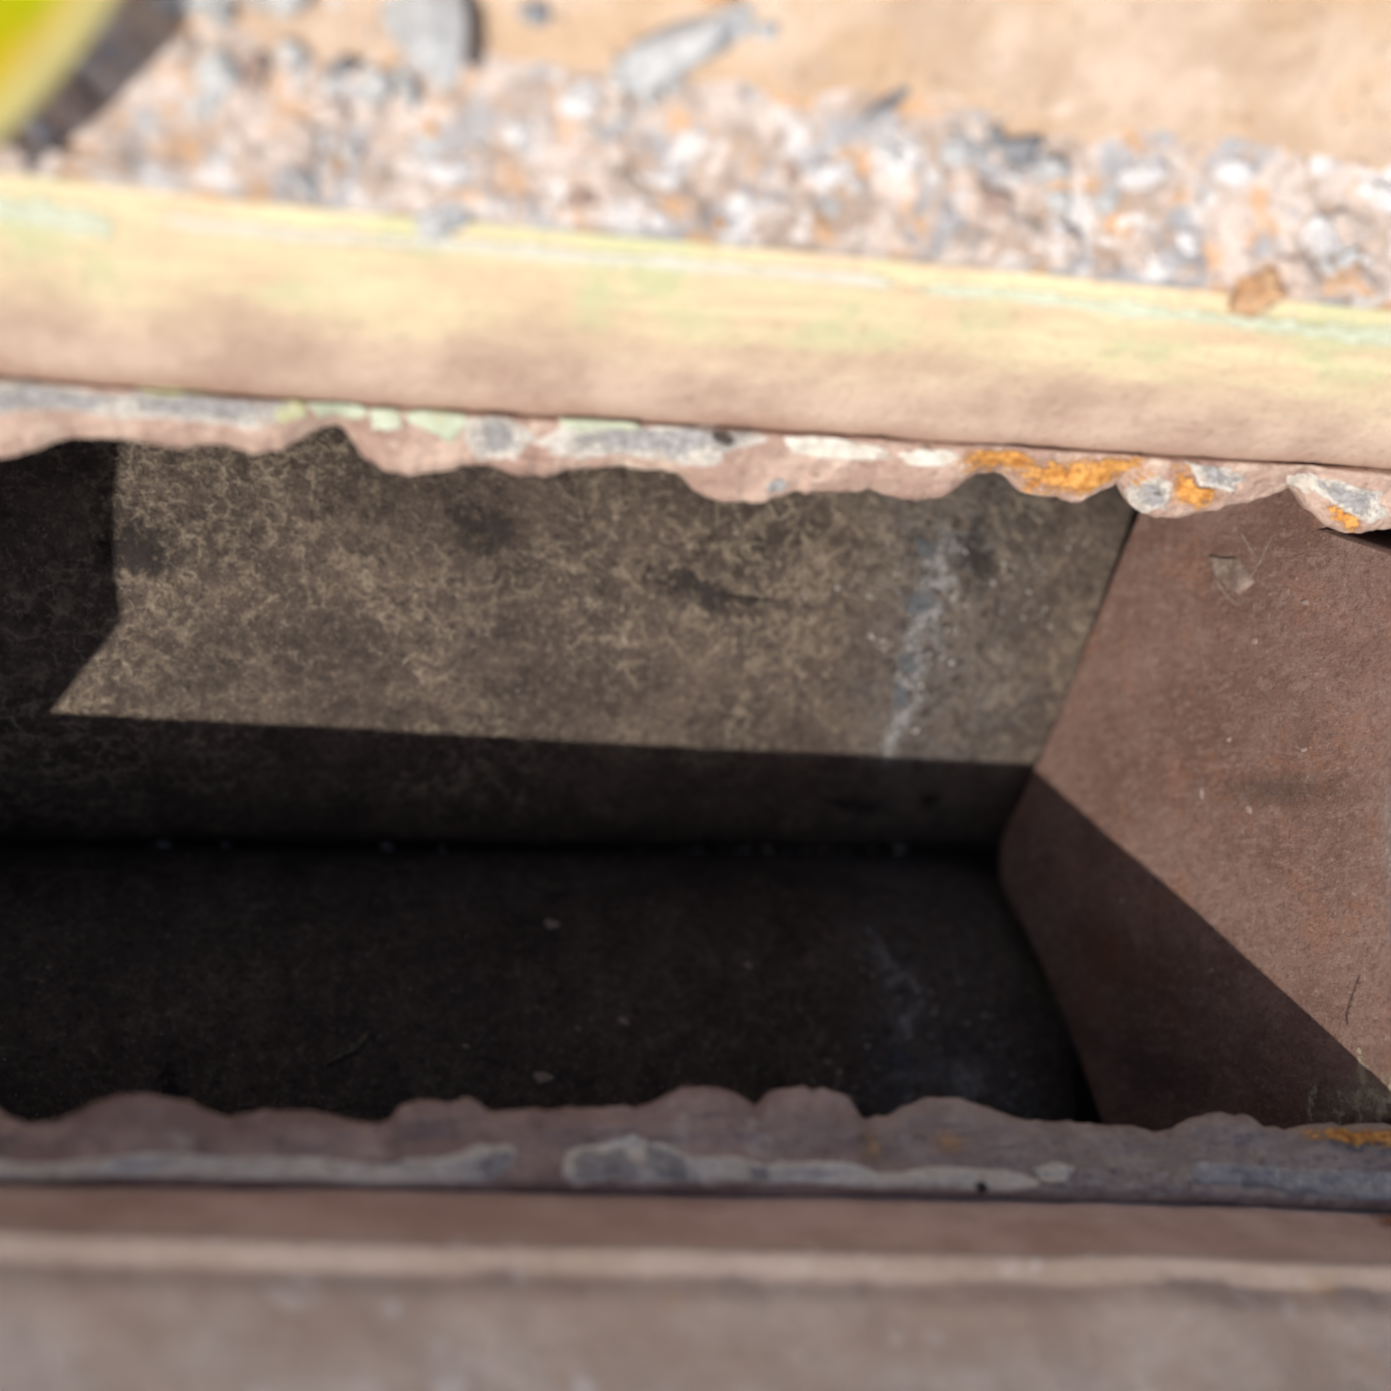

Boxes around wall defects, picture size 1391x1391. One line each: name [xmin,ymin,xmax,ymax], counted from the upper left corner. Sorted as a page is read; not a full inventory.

peeling [0,376,962,467]
rust [957,450,1153,498]
peeling [1124,474,1173,513]
rust [1172,463,1218,511]
peeling [1185,461,1247,492]
peeling [1286,472,1389,523]
rust [1327,505,1362,532]
peeling [0,1143,515,1185]
peeling [561,1134,1391,1201]